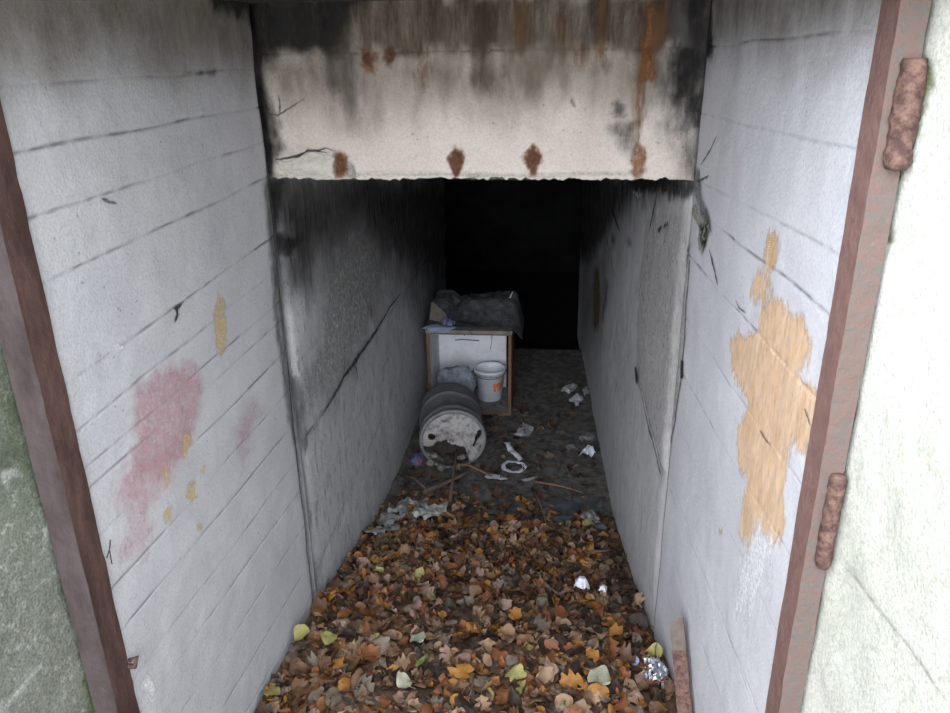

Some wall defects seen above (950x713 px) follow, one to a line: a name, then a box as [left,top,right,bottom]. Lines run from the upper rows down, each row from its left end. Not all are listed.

water stain [280,49,375,106]
rust [631,3,667,178]
crack [276,147,331,160]
rust [333,153,347,177]
rust [447,148,464,176]
rust [523,145,542,176]
crack [315,296,399,427]
peeling [730,230,817,625]